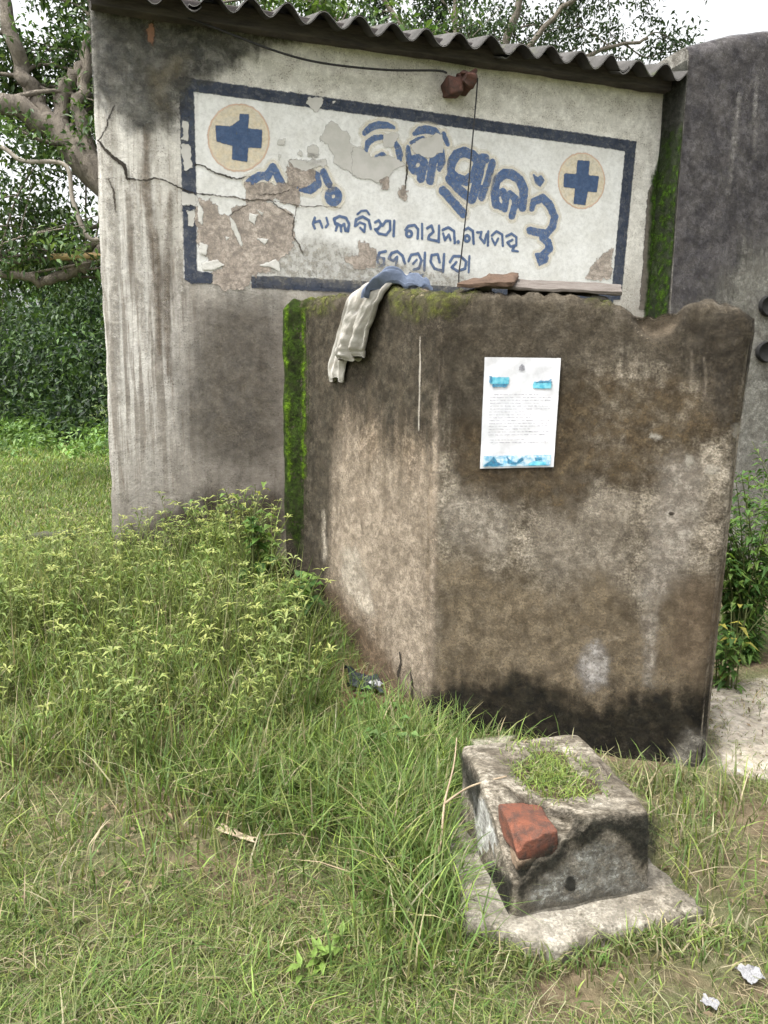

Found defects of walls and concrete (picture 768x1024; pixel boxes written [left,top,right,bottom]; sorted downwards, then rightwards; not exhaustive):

crack [97,105,338,253]
peeling [181,121,407,291]
peeling [306,97,336,112]
peeling [411,133,444,158]
peeling [585,248,614,281]
damp [123,299,316,576]
damp [320,458,711,918]